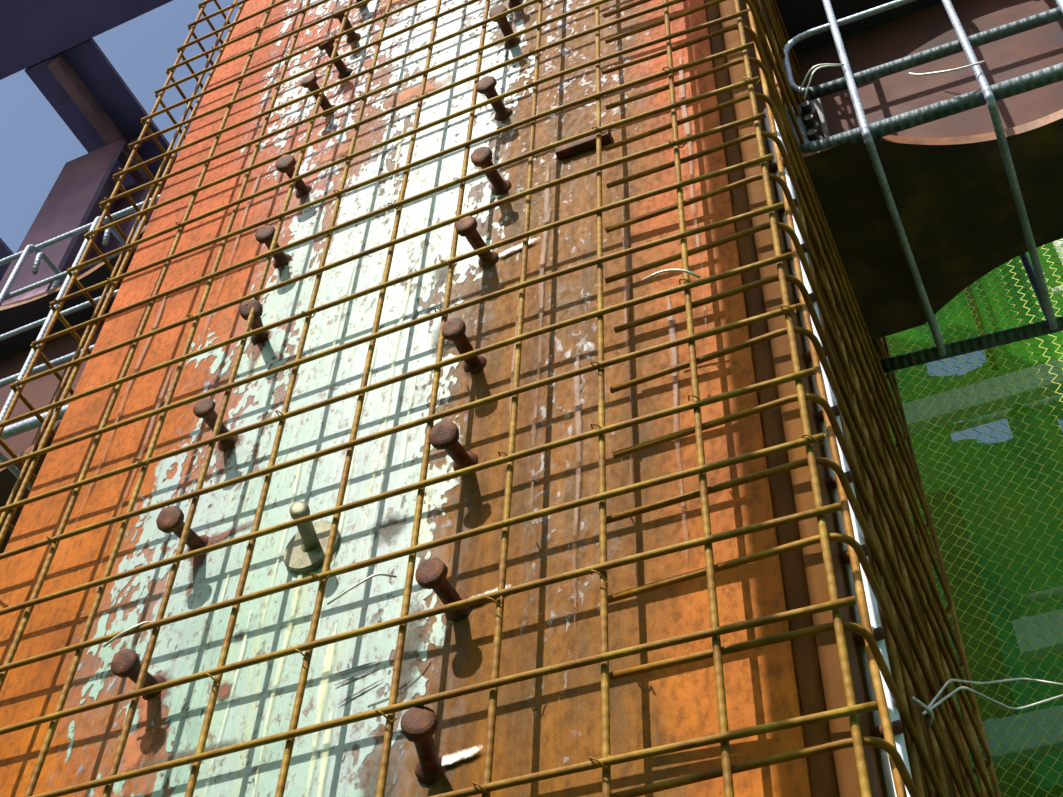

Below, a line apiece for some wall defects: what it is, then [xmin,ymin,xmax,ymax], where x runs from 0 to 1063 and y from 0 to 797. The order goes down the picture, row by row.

rust [387,75,450,106]
rust [679,57,694,208]
rust [229,172,261,262]
rust [540,171,550,317]
rust [111,296,166,434]
rust [117,370,170,514]
rust [214,436,241,482]
peeling [73,0,622,797]
rust [668,295,677,426]
rust [185,521,254,597]
peeling [65,720,75,762]
rust [117,673,169,774]